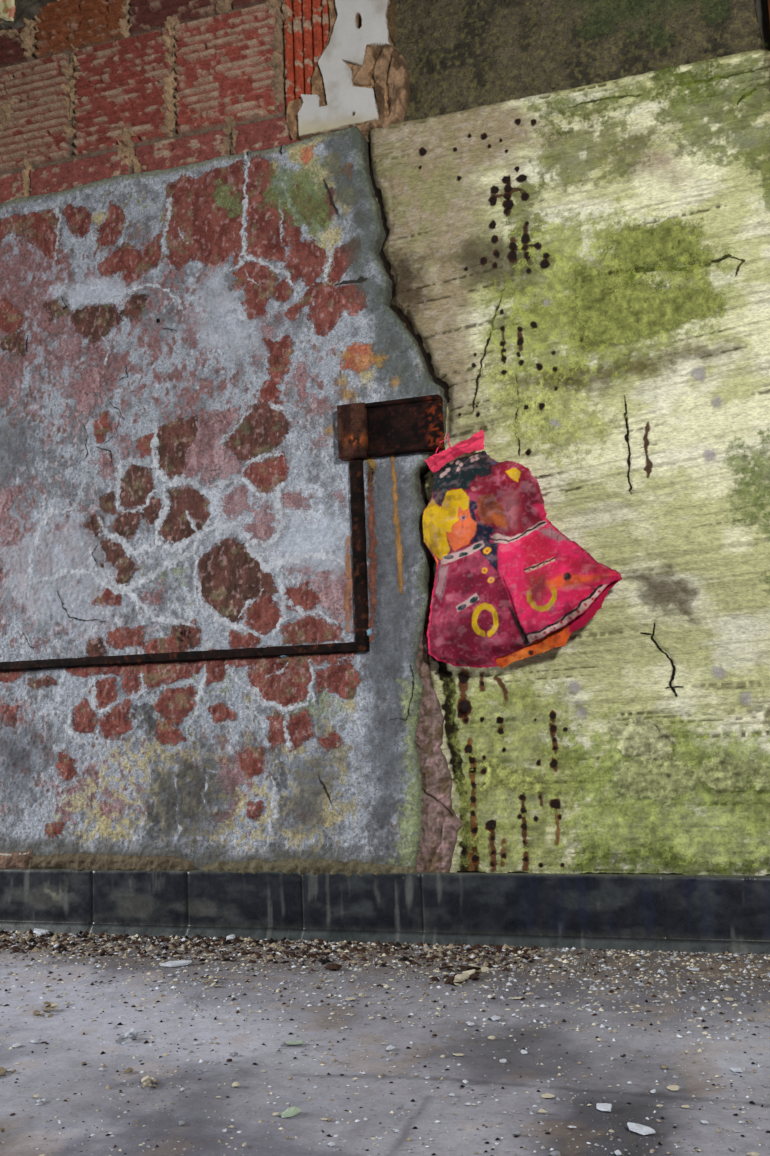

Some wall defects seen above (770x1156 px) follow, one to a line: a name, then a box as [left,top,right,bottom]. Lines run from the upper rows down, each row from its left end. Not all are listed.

spalling [352,0,410,136]
crack [334,158,504,411]
damp [460,50,770,464]
peeling [0,154,373,825]
crack [624,402,653,494]
spalling [0,630,463,879]
crack [389,656,529,873]
corrosion [457,667,508,752]
corrosion [464,738,506,872]
corrosion [517,792,562,871]
damp [451,674,770,875]
crack [641,623,684,697]